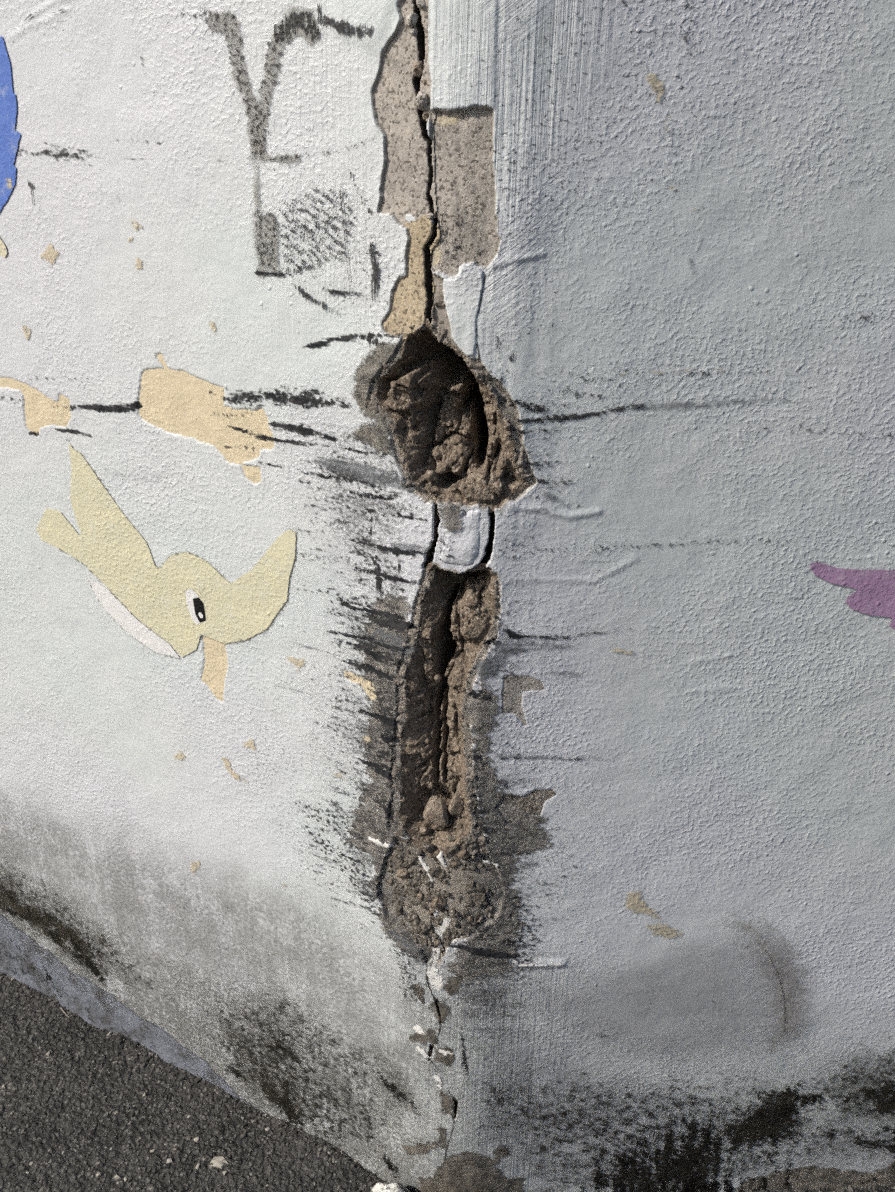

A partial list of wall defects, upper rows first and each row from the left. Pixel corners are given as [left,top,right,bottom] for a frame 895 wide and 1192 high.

crack [406,0,438,338]
spalling [347,0,535,534]
crack [476,275,486,360]
peeling [139,353,274,483]
water stain [350,508,426,584]
crack [424,491,498,576]
water stain [0,866,165,997]
water stain [295,801,378,909]
spalling [331,562,566,1066]
water stain [206,995,419,1178]
crack [426,913,459,1178]
water stain [484,1038,895,1192]